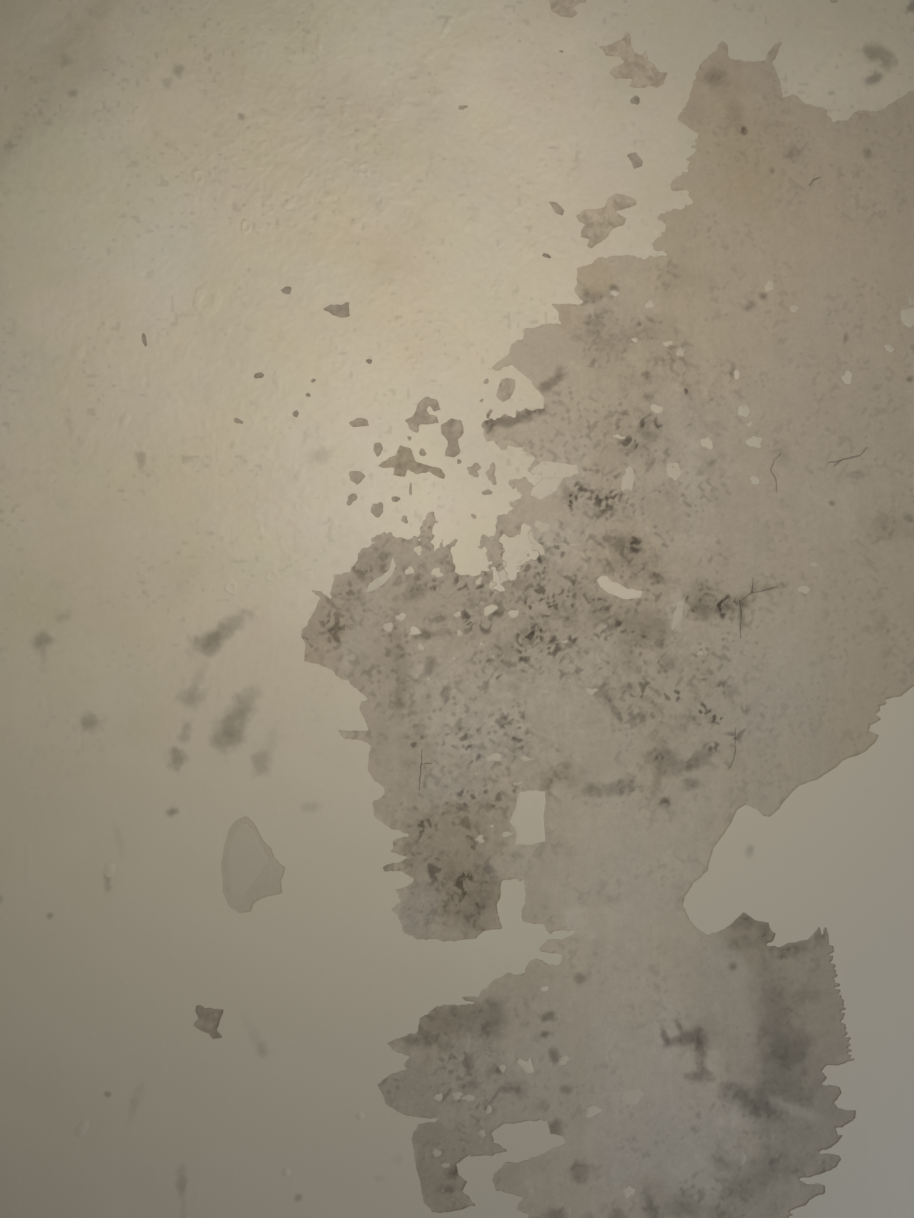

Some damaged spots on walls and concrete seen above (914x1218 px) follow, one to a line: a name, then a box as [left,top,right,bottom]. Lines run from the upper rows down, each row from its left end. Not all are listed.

peeling [548,0,586,18]
peeling [301,33,914,1218]
peeling [221,816,285,913]
peeling [193,1005,223,1039]